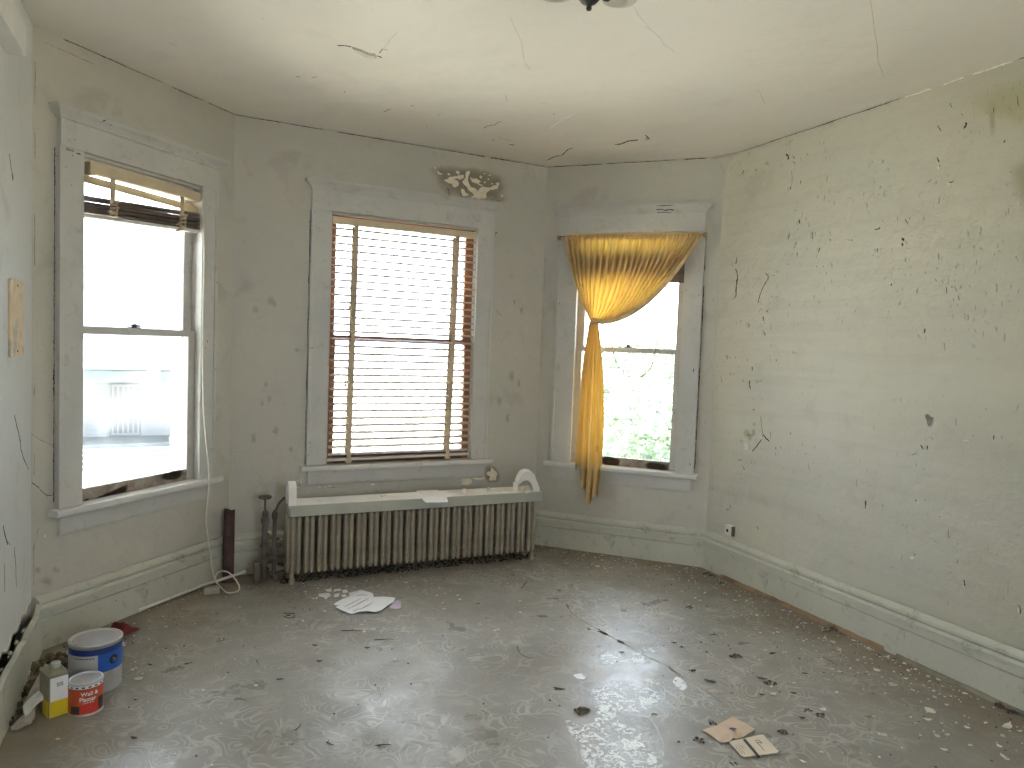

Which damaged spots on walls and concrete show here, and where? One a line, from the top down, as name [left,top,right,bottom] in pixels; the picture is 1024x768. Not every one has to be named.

crack [46,36,706,167]
peeling [434,167,504,201]
crack [14,415,55,498]
crack [744,421,771,452]
flaking render [911,414,934,456]